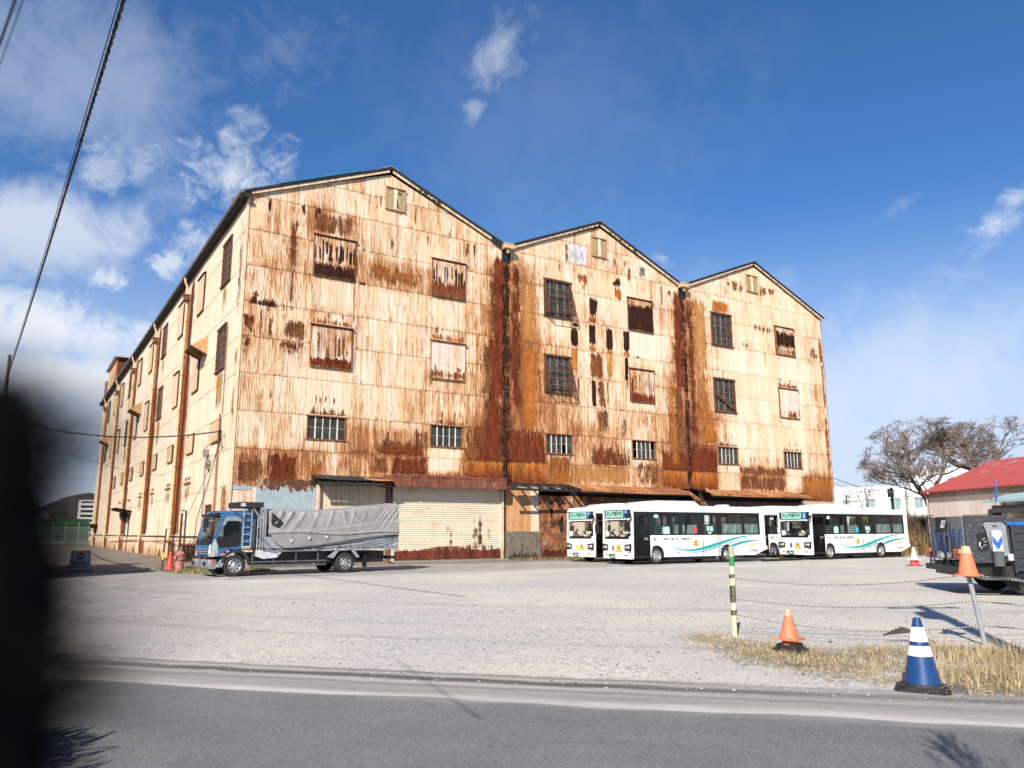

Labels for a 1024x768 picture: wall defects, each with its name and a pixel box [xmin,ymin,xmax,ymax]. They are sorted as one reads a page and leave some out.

corrosion [223,204,465,370]
corrosion [754,324,795,356]
corrosion [431,256,737,490]
corrosion [215,374,235,432]
corrosion [236,453,322,483]
corrosion [353,429,429,475]
corrosion [740,457,785,491]
corrosion [395,521,501,560]